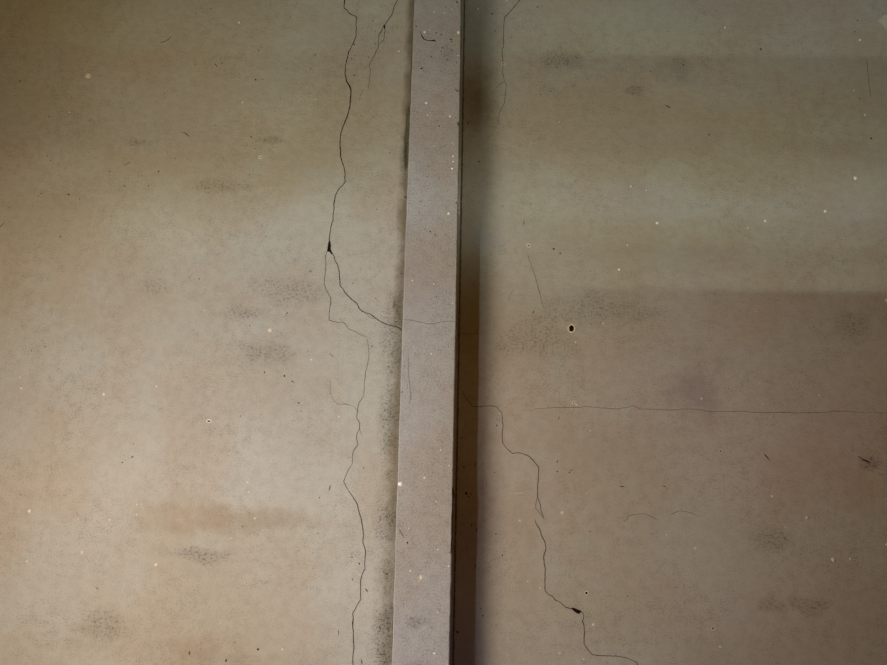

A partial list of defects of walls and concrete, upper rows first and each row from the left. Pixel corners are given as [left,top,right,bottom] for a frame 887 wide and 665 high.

crack [324,0,478,663]
crack [463,393,638,665]